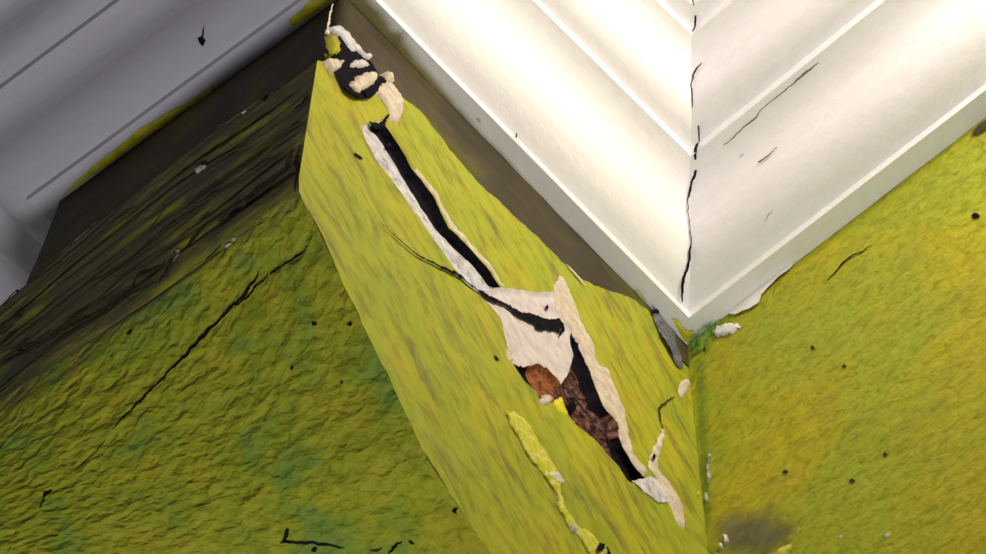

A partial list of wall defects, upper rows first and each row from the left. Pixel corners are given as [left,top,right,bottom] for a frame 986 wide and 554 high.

spalling [319,4,404,124]
crack [724,62,819,145]
water stain [971,120,986,135]
crack [681,63,702,302]
crack [827,245,871,280]
crack [73,246,308,471]
spalling [478,264,669,503]
flaking render [678,379,690,398]
peeling [506,410,611,554]
crack [280,529,344,552]
crack [370,541,415,554]
water stain [718,520,784,549]